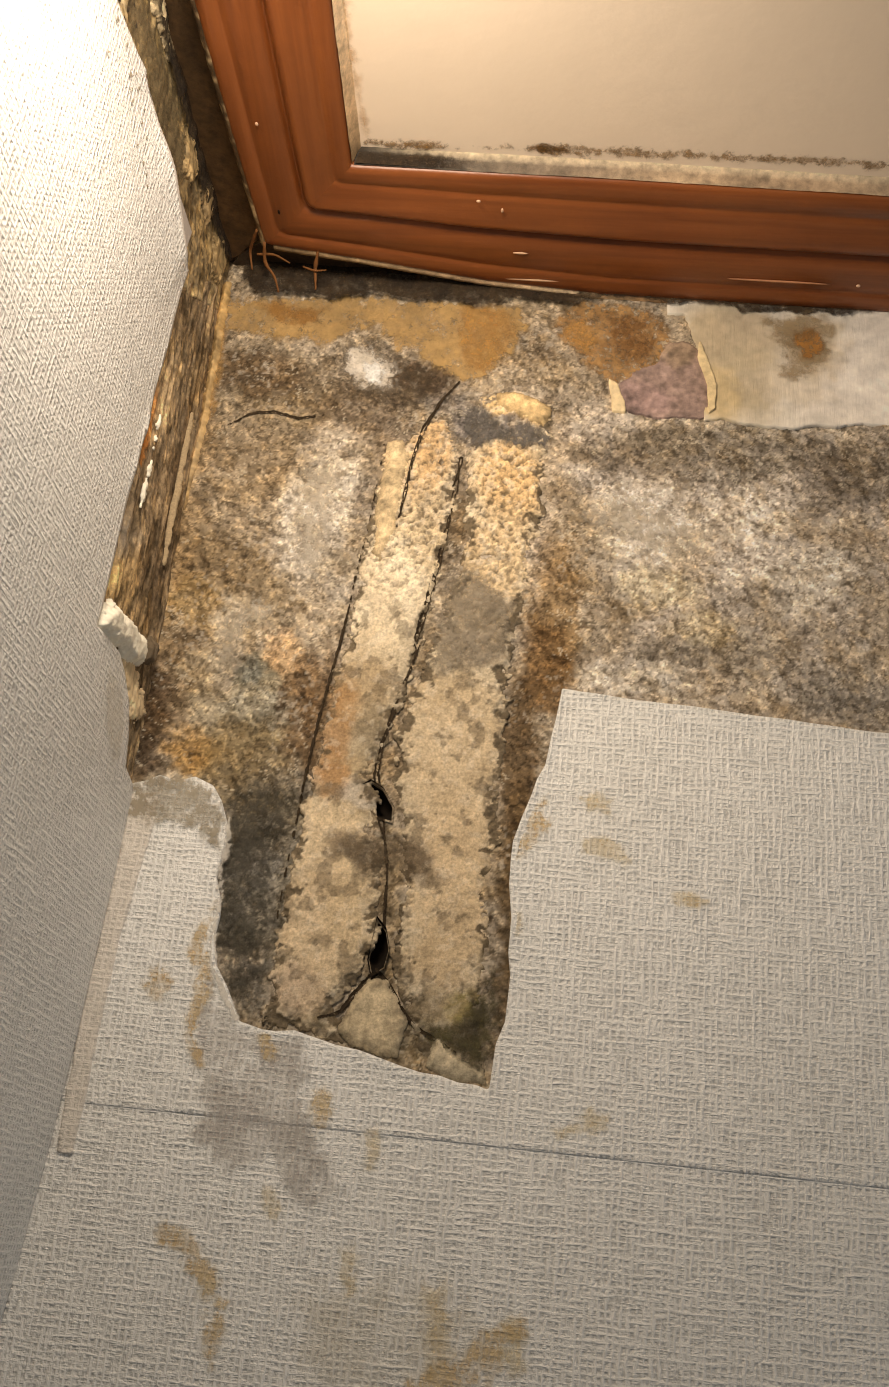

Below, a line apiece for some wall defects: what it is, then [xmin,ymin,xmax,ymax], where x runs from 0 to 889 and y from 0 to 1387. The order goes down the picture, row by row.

leakage [117,0,886,316]
crack [277,381,463,1053]
leakage [428,979,500,1065]
peeling [104,0,889,1089]